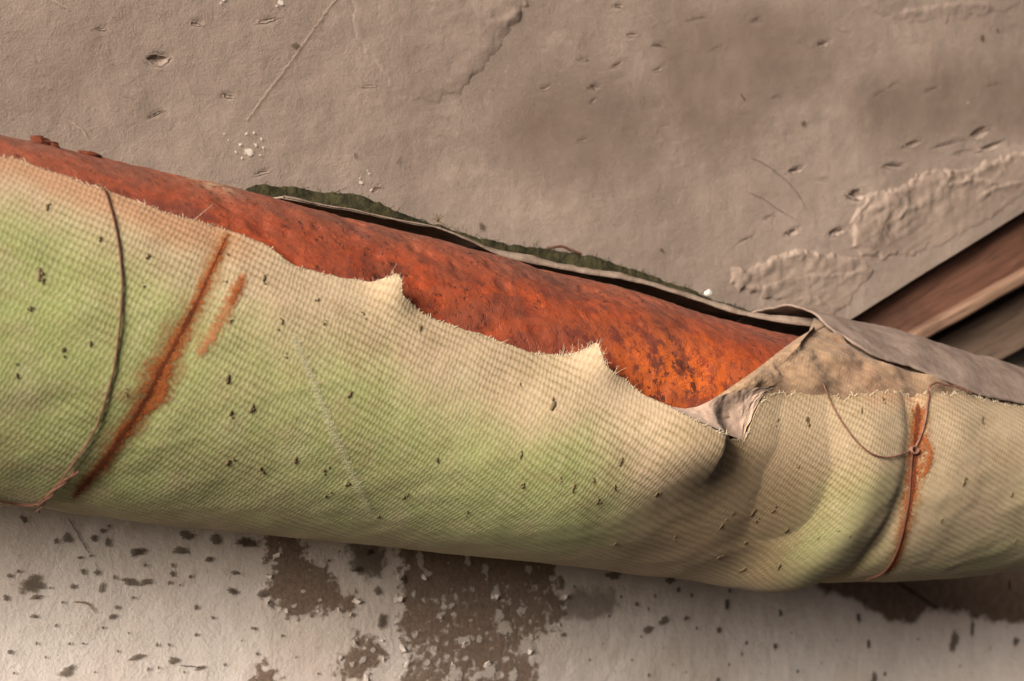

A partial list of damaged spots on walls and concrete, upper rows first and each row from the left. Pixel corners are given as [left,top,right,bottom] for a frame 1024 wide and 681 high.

rust [29,135,60,148]
rust [71,234,246,498]
rust [886,403,935,573]
peeling [248,658,285,681]
peeling [254,535,361,621]
peeling [333,631,389,681]
peeling [392,548,568,681]